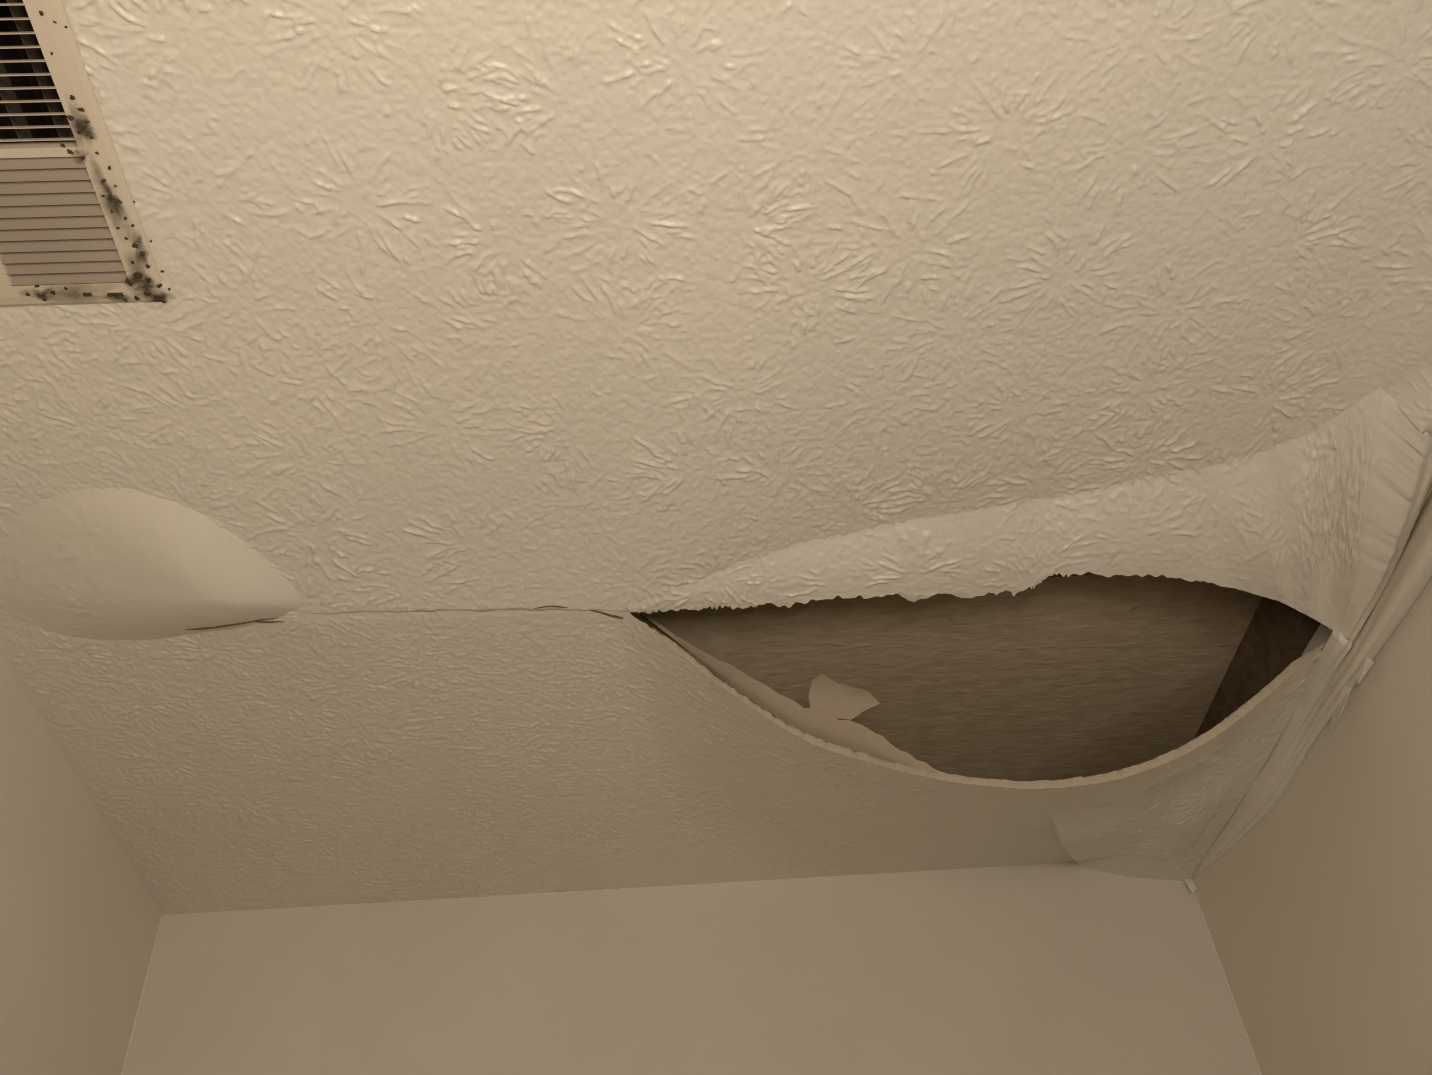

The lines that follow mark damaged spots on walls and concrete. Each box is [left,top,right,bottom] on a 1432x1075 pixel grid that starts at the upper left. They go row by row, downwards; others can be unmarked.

leakage [25,285,81,301]
leakage [60,95,171,303]
crack [185,605,628,630]
peeling [1184,351,1432,893]